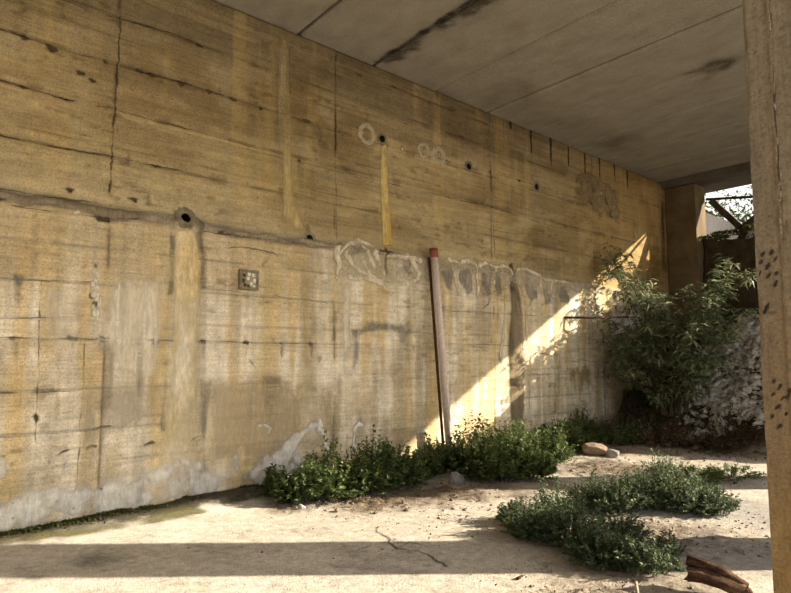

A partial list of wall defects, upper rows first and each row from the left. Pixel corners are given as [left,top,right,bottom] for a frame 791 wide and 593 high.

crack [0,29,58,52]
crack [77,15,236,101]
damp [377,0,494,62]
crack [99,106,195,131]
crack [50,145,180,192]
damp [283,140,303,229]
damp [0,221,332,541]
crack [356,526,447,567]